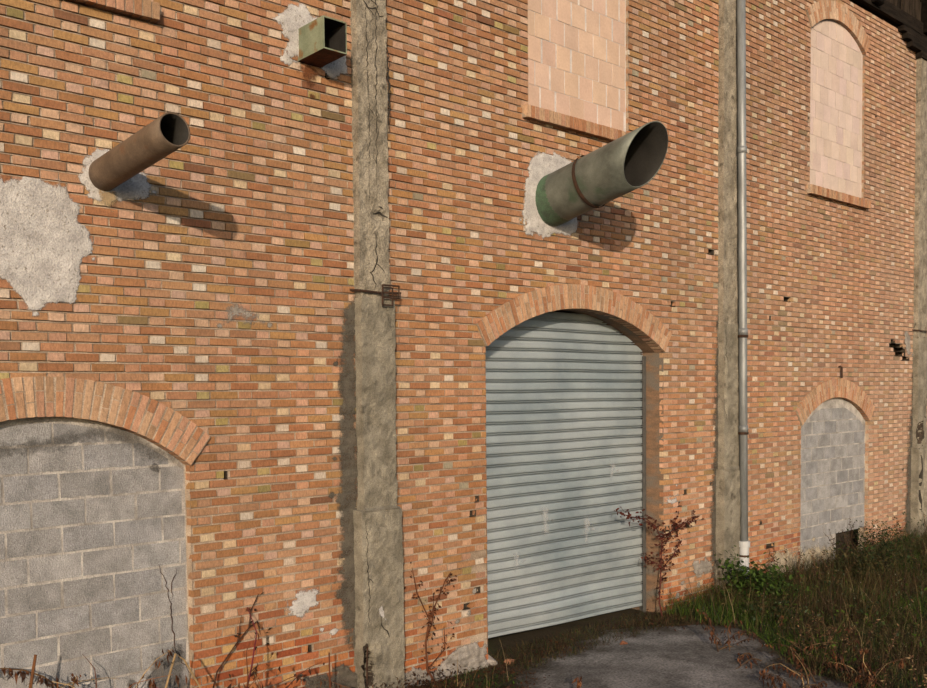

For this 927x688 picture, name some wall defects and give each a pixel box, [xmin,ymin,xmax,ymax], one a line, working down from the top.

crack [363,0,391,218]
crack [370,241,385,288]
spalling [887,339,909,361]
crack [159,566,189,672]